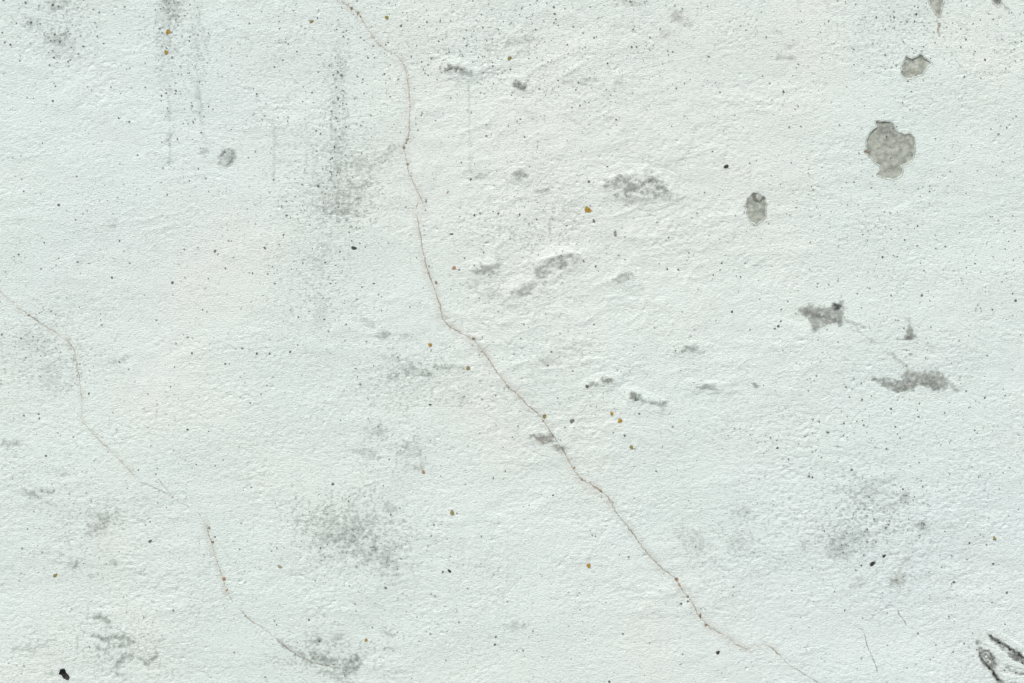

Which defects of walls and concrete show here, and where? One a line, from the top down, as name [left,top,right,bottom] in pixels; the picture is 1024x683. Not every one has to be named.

peeling [900,53,933,80]
peeling [863,119,916,182]
peeling [744,191,768,226]
spalling [799,301,843,329]
spalling [874,371,948,391]